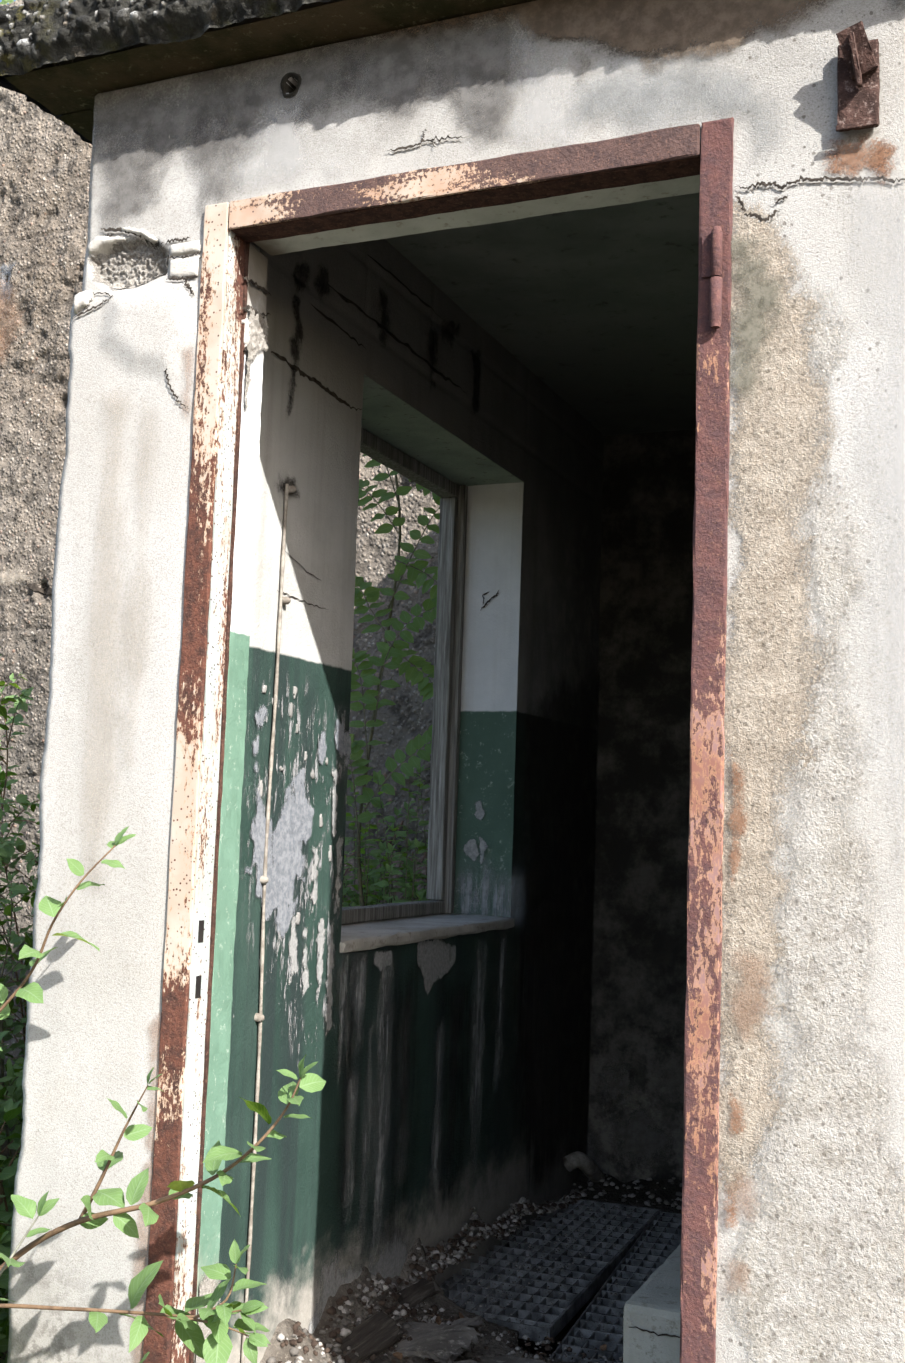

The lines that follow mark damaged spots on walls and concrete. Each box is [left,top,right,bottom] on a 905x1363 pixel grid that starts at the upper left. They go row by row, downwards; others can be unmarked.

crack [387,129,468,153]
damp [92,0,830,228]
crack [735,175,905,223]
corrosion [823,135,897,183]
spalling [73,227,202,314]
flaking render [718,197,905,1363]
peeling [245,685,351,1054]
damp [340,959,364,1044]
peeling [374,950,392,971]
peeling [417,939,456,995]
damp [460,673,599,1164]
damp [350,968,403,1274]